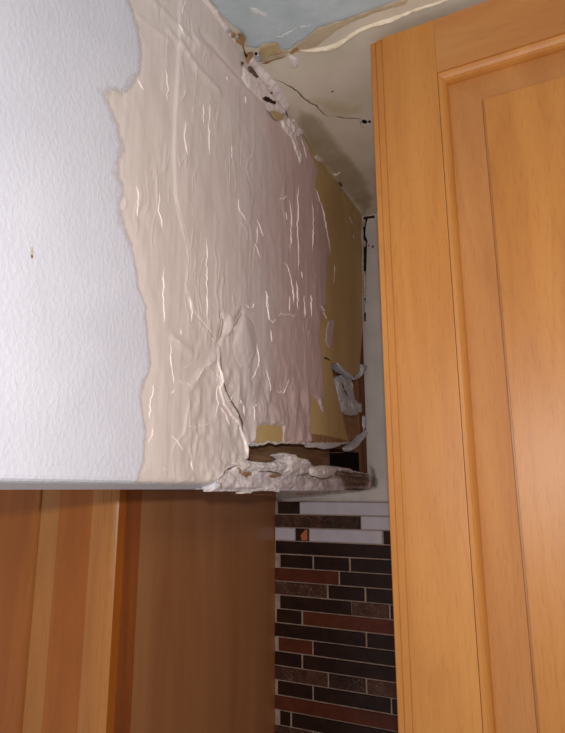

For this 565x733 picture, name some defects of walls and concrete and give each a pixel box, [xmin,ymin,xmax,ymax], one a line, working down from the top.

peeling [210,0,399,65]
crack [262,55,363,127]
crack [194,314,249,460]
spalling [203,441,371,494]